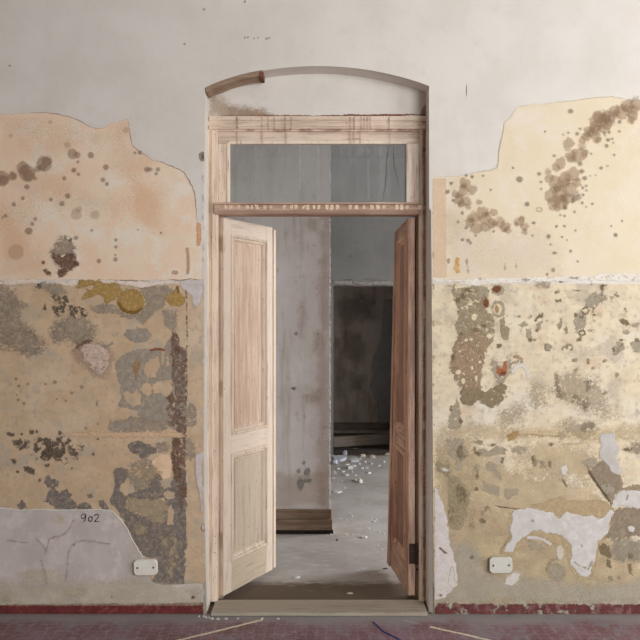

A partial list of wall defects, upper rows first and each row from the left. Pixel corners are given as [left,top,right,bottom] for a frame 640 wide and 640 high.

water stain [42,235,79,277]
peeling [0,112,204,432]
peeling [433,96,640,500]
peeling [43,440,188,585]